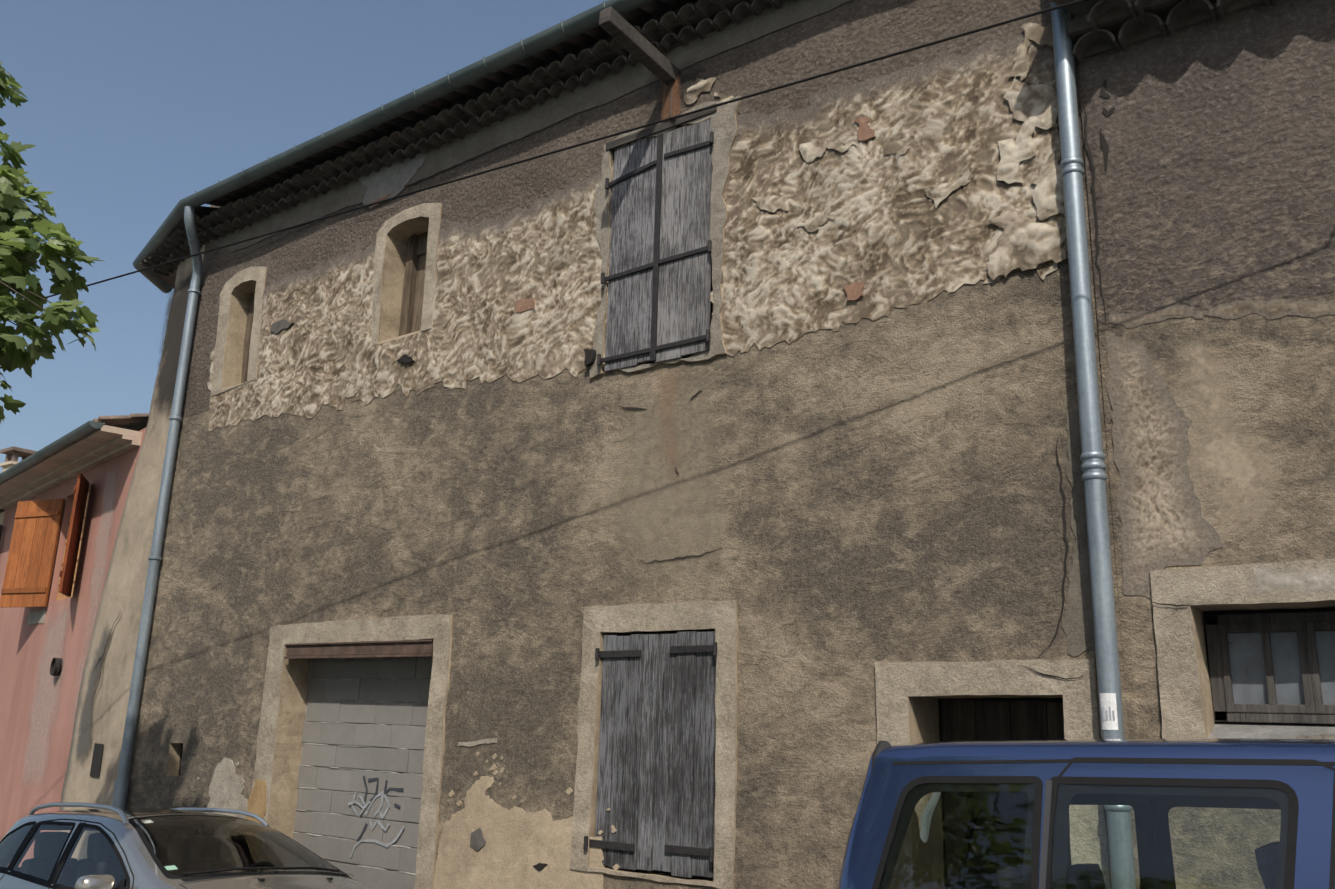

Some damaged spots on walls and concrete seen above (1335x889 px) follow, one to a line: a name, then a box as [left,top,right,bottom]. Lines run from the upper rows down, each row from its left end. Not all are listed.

flaking render [207,168,623,431]
flaking render [684,23,1068,360]
crack [1083,80,1115,324]
crack [1021,438,1082,680]
flaking render [434,752,620,889]